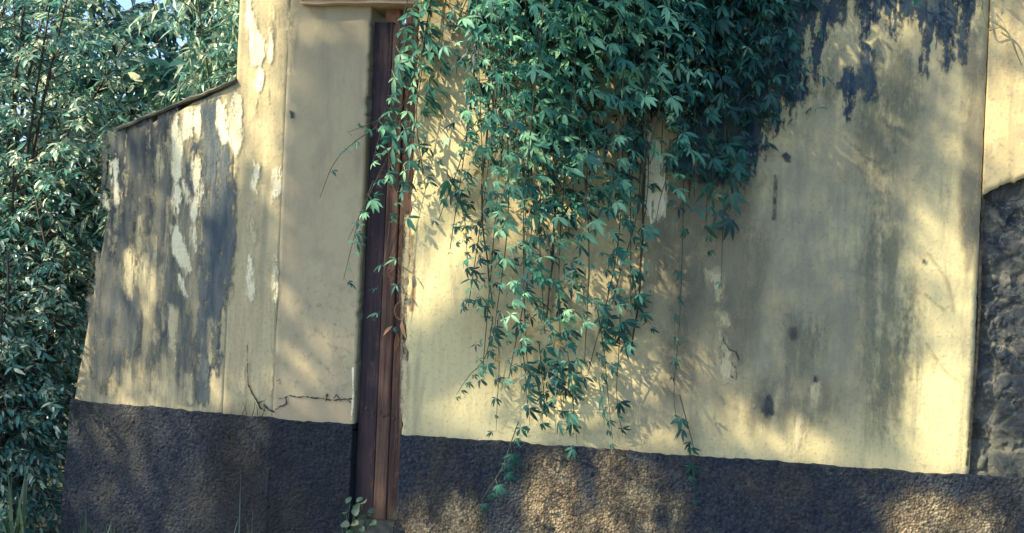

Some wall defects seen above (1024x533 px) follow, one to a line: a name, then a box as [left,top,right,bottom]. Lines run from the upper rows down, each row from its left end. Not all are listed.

peeling [216,0,295,156]
peeling [103,158,120,210]
peeling [124,215,157,299]
damp [87,96,237,407]
peeling [156,107,204,298]
peeling [250,159,282,201]
peeling [639,119,669,224]
damp [657,0,983,395]
crack [247,345,352,413]
spalling [705,269,734,384]
damp [749,384,828,424]
damp [865,213,911,433]